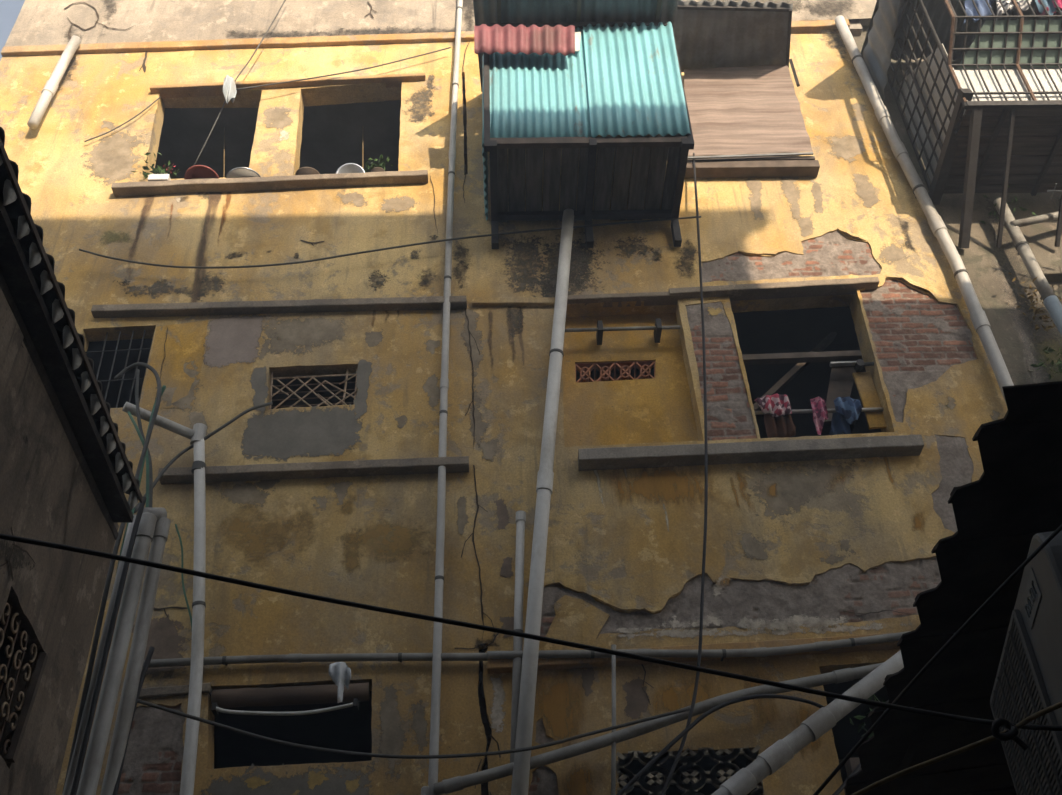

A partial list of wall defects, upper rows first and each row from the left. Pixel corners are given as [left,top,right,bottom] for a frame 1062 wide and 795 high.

peeling [826,135,881,208]
water stain [113,192,225,302]
water stain [500,232,660,364]
water stain [676,240,697,277]
flaking render [702,177,977,423]
flaking render [931,434,974,533]
crack [454,308,501,795]
flaking render [540,551,941,646]
flaking render [117,704,185,795]